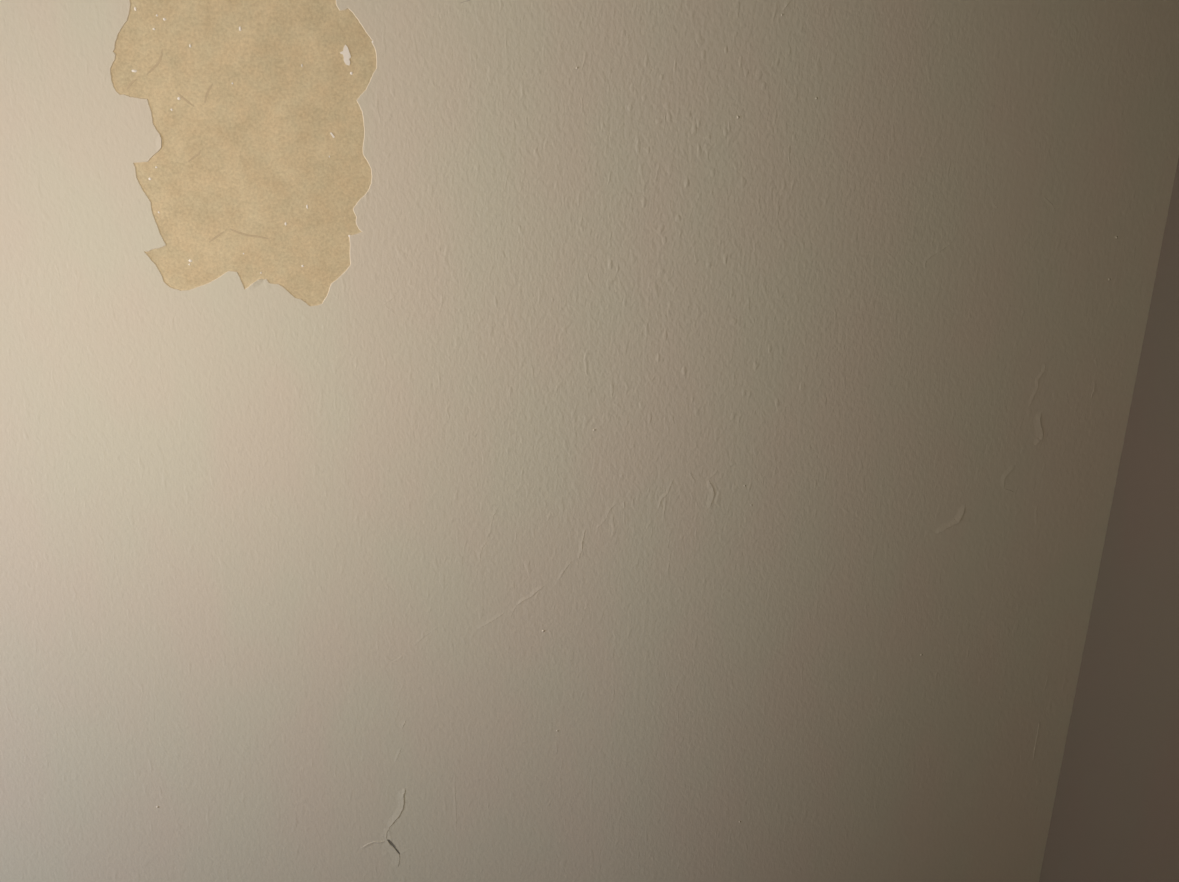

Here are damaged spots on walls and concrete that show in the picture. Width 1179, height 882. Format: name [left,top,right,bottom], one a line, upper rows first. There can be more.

peeling [110,0,377,306]